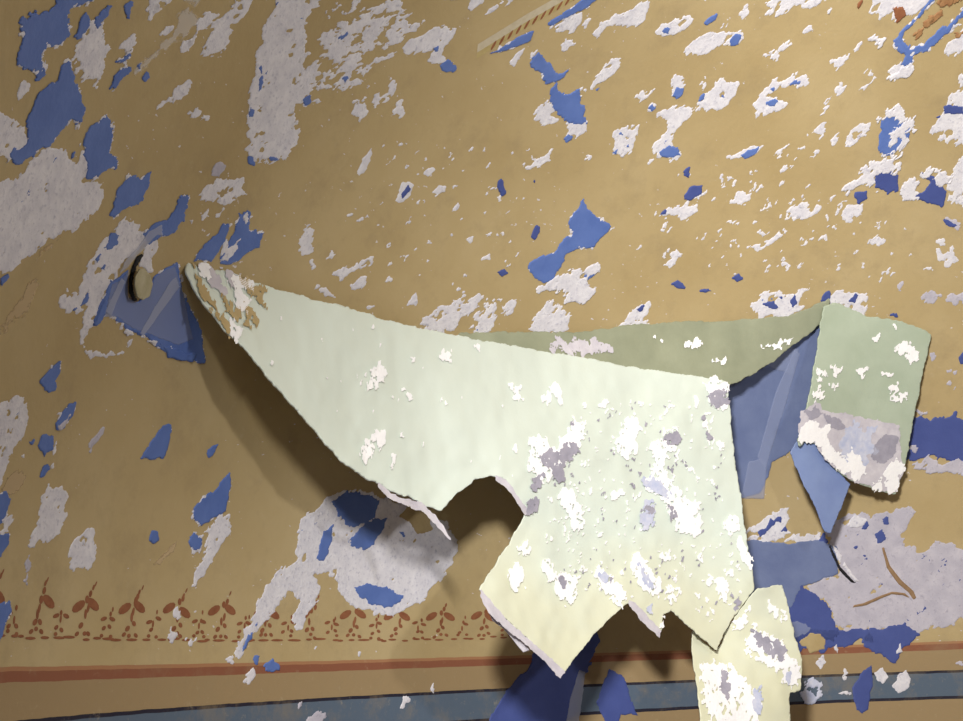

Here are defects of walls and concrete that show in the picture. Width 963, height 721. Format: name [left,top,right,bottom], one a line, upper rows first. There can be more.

peeling [145,0,172,21]
peeling [180,0,253,57]
peeling [0,0,150,286]
flaking render [156,79,192,110]
flaking render [187,107,210,121]
peeling [244,0,457,166]
flaking render [357,145,385,175]
peeling [635,74,740,165]
peeling [58,162,963,721]